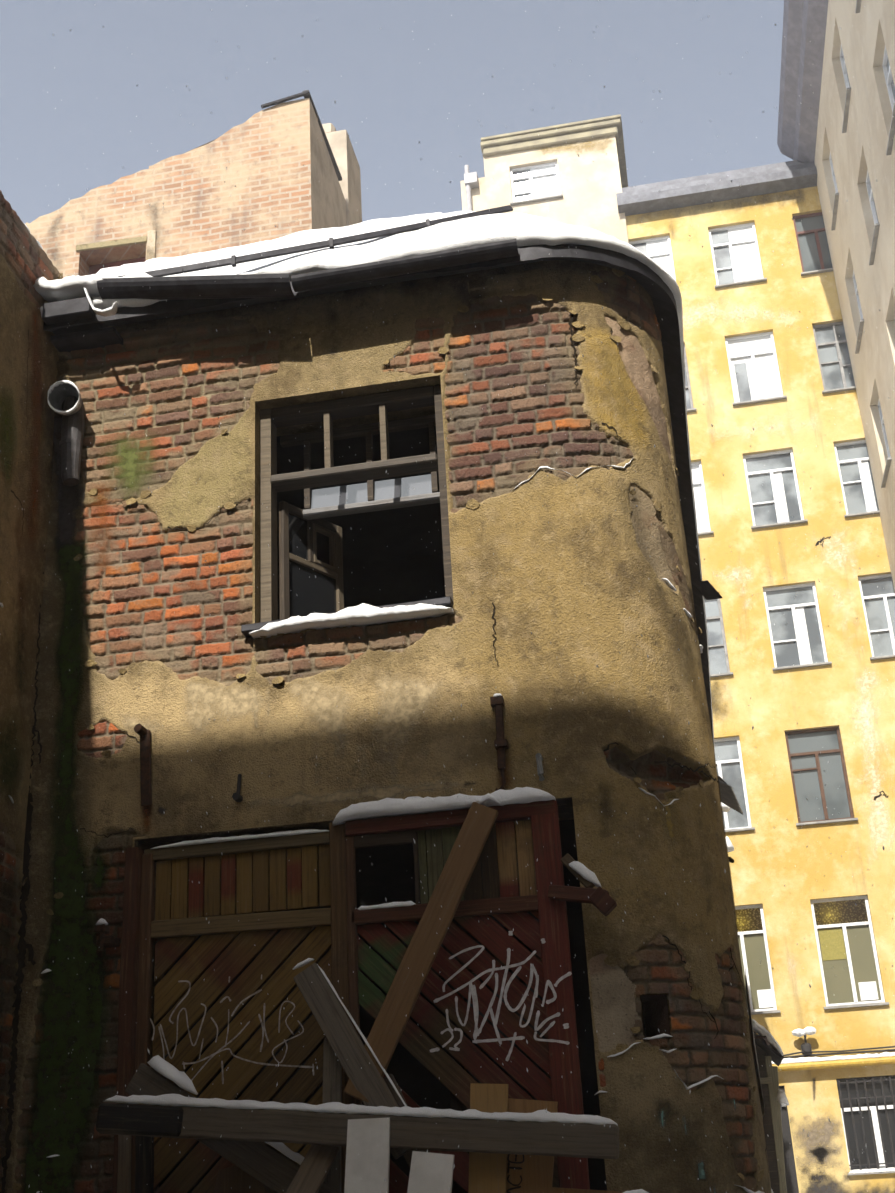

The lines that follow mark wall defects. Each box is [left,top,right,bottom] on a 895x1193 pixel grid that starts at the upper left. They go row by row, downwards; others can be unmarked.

flaking render [64,318,463,686]
flaking render [383,294,633,513]
crack [568,314,578,386]
crack [491,602,499,666]
crack [1,490,45,1193]
flaking render [604,747,704,806]
flaking render [72,828,146,1193]
flaking render [589,933,764,1192]